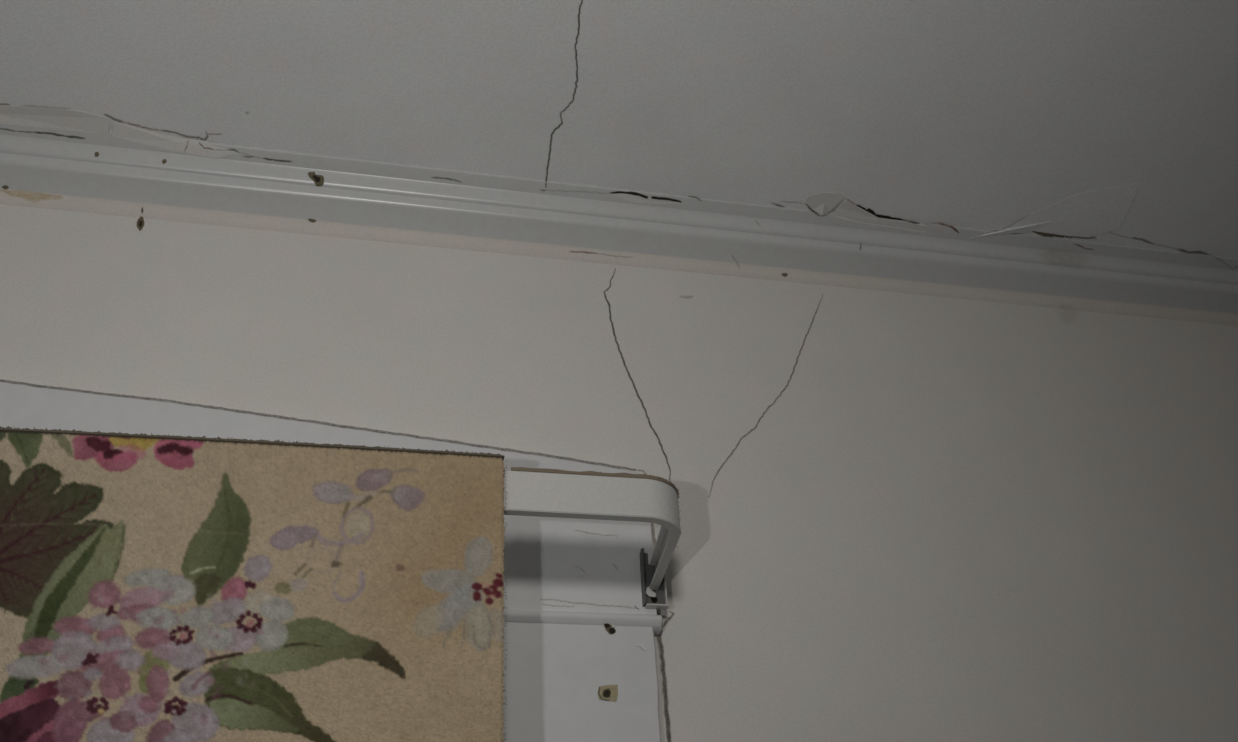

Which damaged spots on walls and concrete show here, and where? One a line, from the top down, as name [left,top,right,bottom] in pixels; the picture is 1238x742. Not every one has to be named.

crack [544,0,583,191]
crack [712,311,817,484]